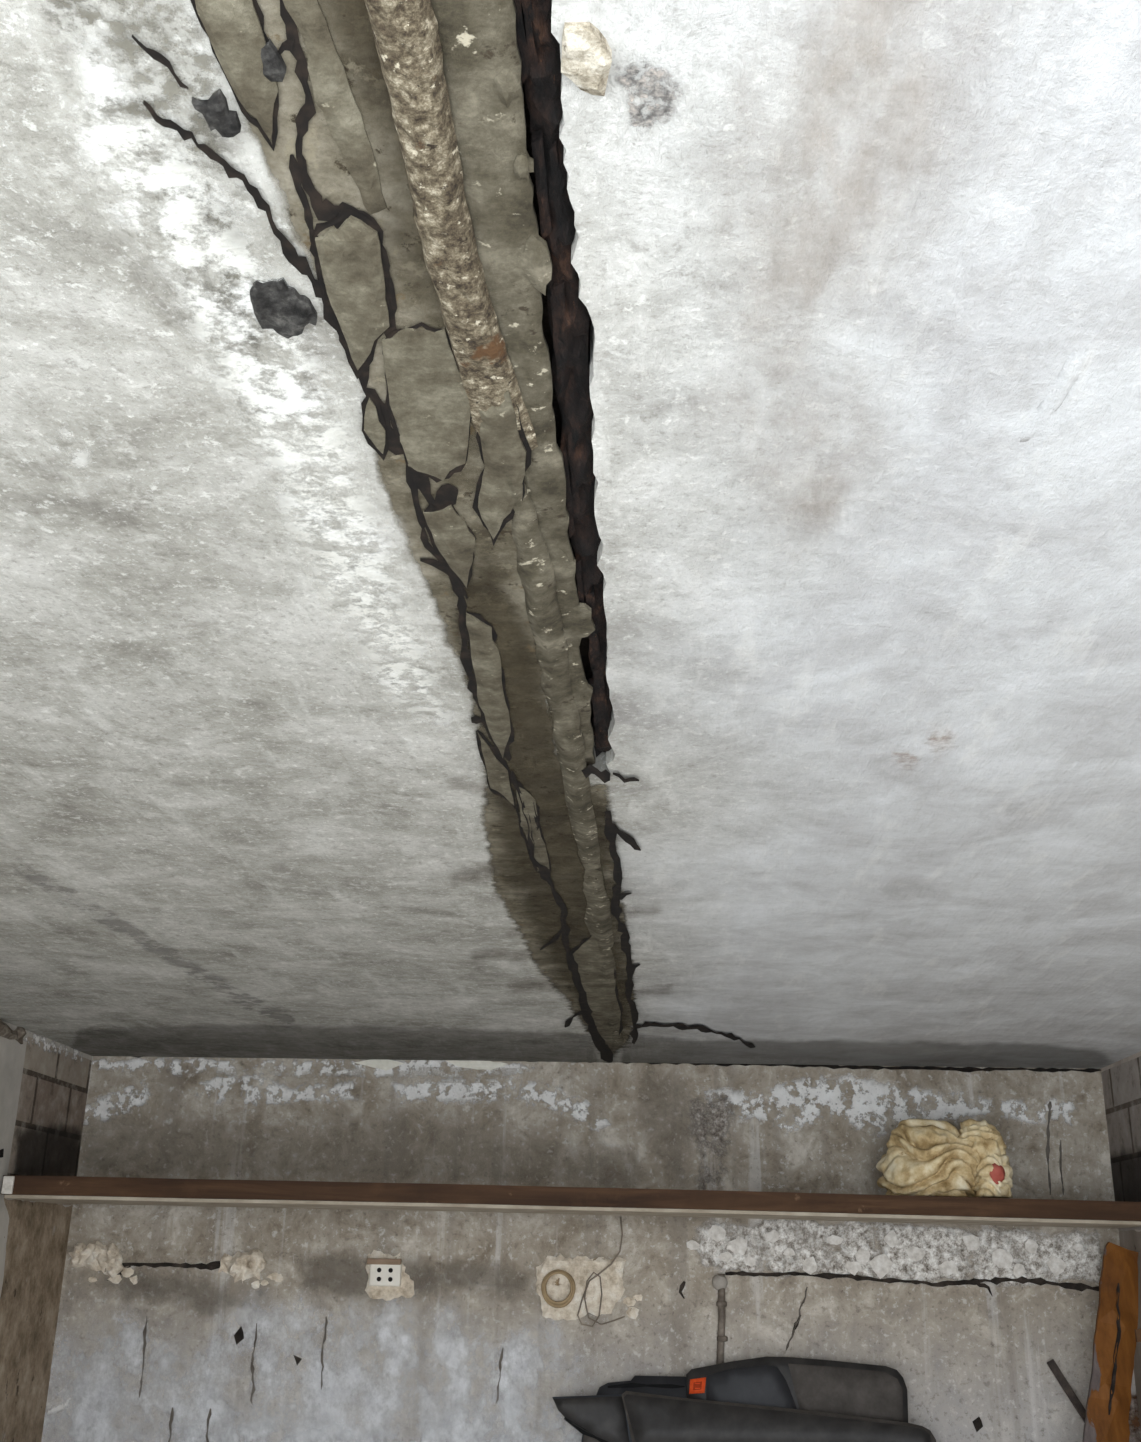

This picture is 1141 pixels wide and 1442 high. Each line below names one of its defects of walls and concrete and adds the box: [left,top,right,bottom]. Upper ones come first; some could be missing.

crack [132,35,188,89]
spalling [191,0,287,151]
peeling [561,22,678,128]
spalling [250,0,532,589]
damp [49,0,636,1053]
crack [143,0,1101,1195]
spalling [465,611,551,873]
spalling [571,935,623,1048]
crack [107,1261,220,1281]
crack [678,1281,686,1299]
spalling [687,1219,1102,1285]
crack [725,1271,1099,1351]